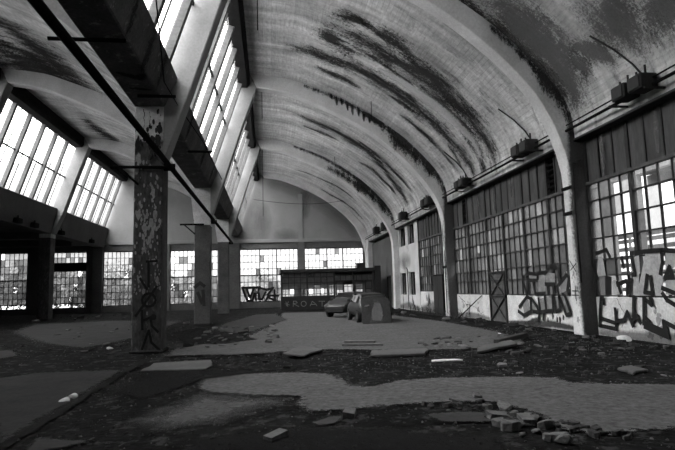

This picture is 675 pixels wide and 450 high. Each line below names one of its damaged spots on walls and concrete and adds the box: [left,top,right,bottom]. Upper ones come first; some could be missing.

water stain [0,35,81,85]
peeling [133,109,163,295]
water stain [315,66,362,88]
water stain [294,146,394,221]
water stain [304,84,445,192]
water stain [362,22,420,65]
water stain [335,43,486,175]
water stain [483,0,675,122]